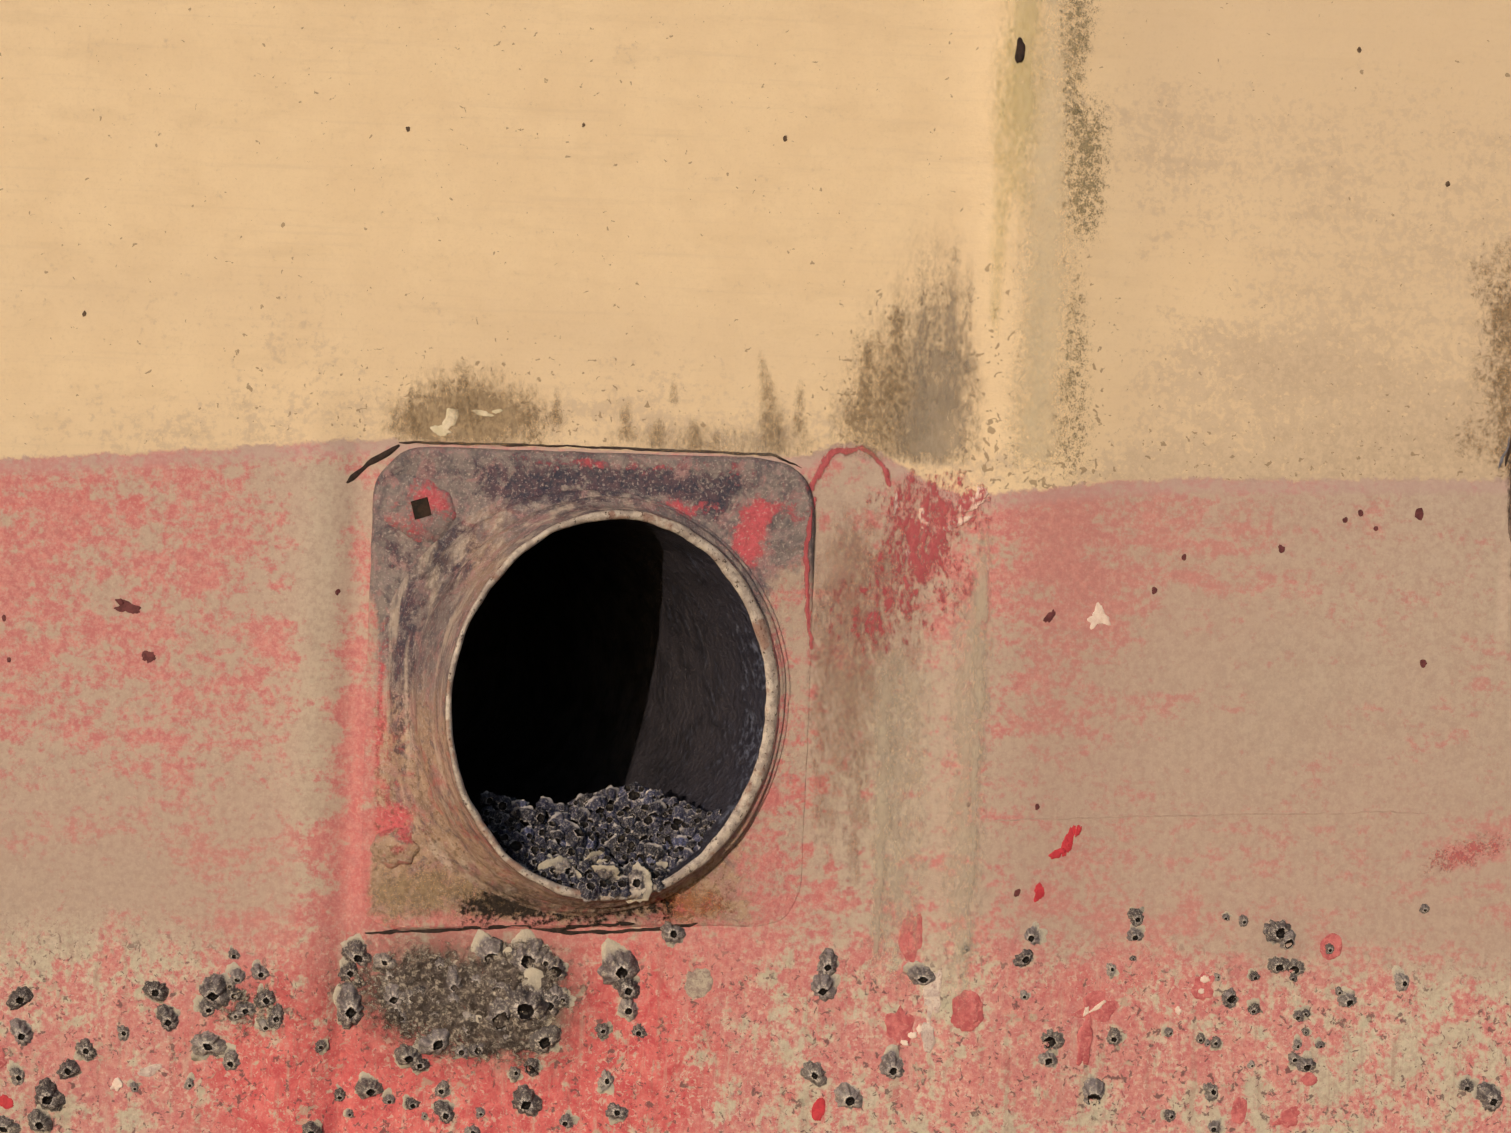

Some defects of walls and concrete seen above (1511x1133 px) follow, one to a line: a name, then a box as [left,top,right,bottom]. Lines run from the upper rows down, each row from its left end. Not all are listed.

mould [1060,0,1108,234]
leakage [392,381,558,443]
leakage [846,296,968,459]
mould [1058,294,1087,467]
peeling [803,445,991,654]
peeling [1014,882,1045,902]
peeling [898,911,923,963]
peeling [885,970,984,1053]
peeling [1071,990,1118,1066]
peeling [0,1094,14,1109]
peeling [811,1098,826,1121]
peeling [1231,1097,1247,1124]